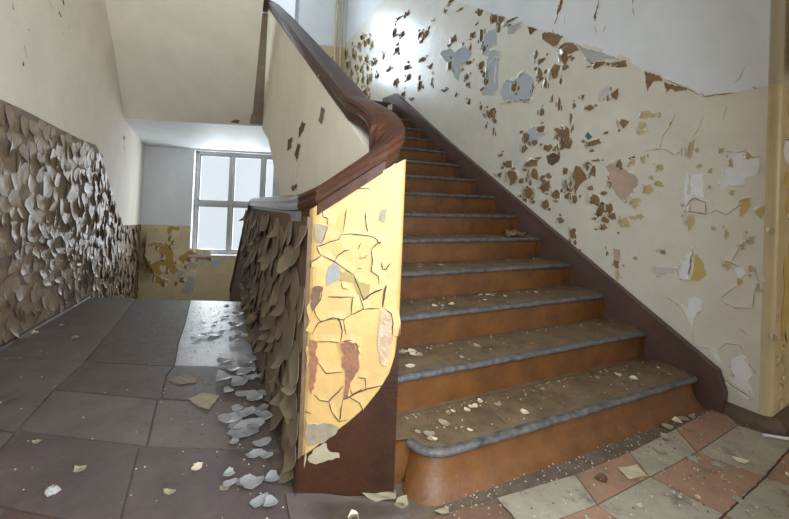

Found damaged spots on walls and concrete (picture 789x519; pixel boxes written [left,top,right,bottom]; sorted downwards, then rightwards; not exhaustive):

peeling [0,100,219,345]
peeling [287,121,306,173]
peeling [345,0,775,284]
peeling [188,393,219,409]
peeling [239,209,370,494]
crack [304,207,401,422]
flaking render [377,308,393,367]
peeling [710,347,755,402]
peeling [772,256,789,409]